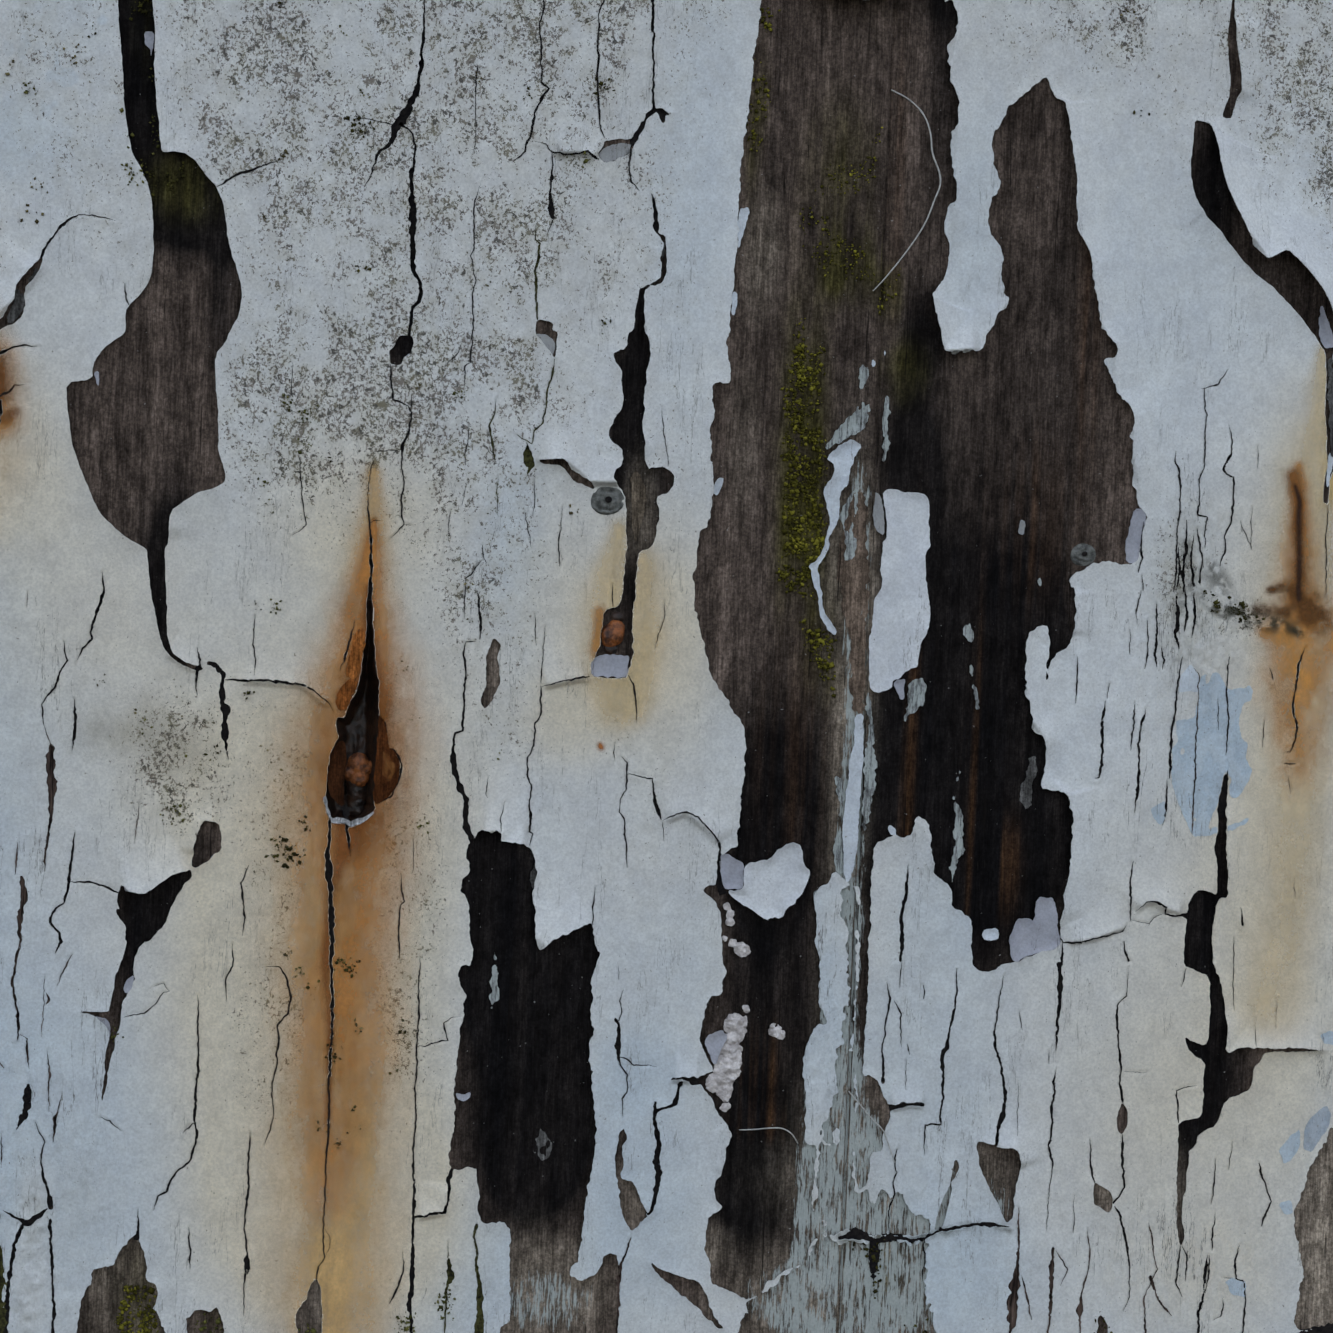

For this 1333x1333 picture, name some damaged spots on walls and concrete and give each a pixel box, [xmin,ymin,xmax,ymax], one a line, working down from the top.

corrosion [0,349,17,430]
crack [0,573,119,1333]
peeling [66,0,242,670]
corrosion [292,469,392,1333]
peeling [448,830,621,1333]
crack [514,0,671,320]
corrosion [592,526,654,719]
peeling [651,0,1147,1333]
crack [838,861,1277,1333]
crack [1075,371,1259,831]
peeling [1191,0,1333,504]
corrosion [1254,348,1333,817]